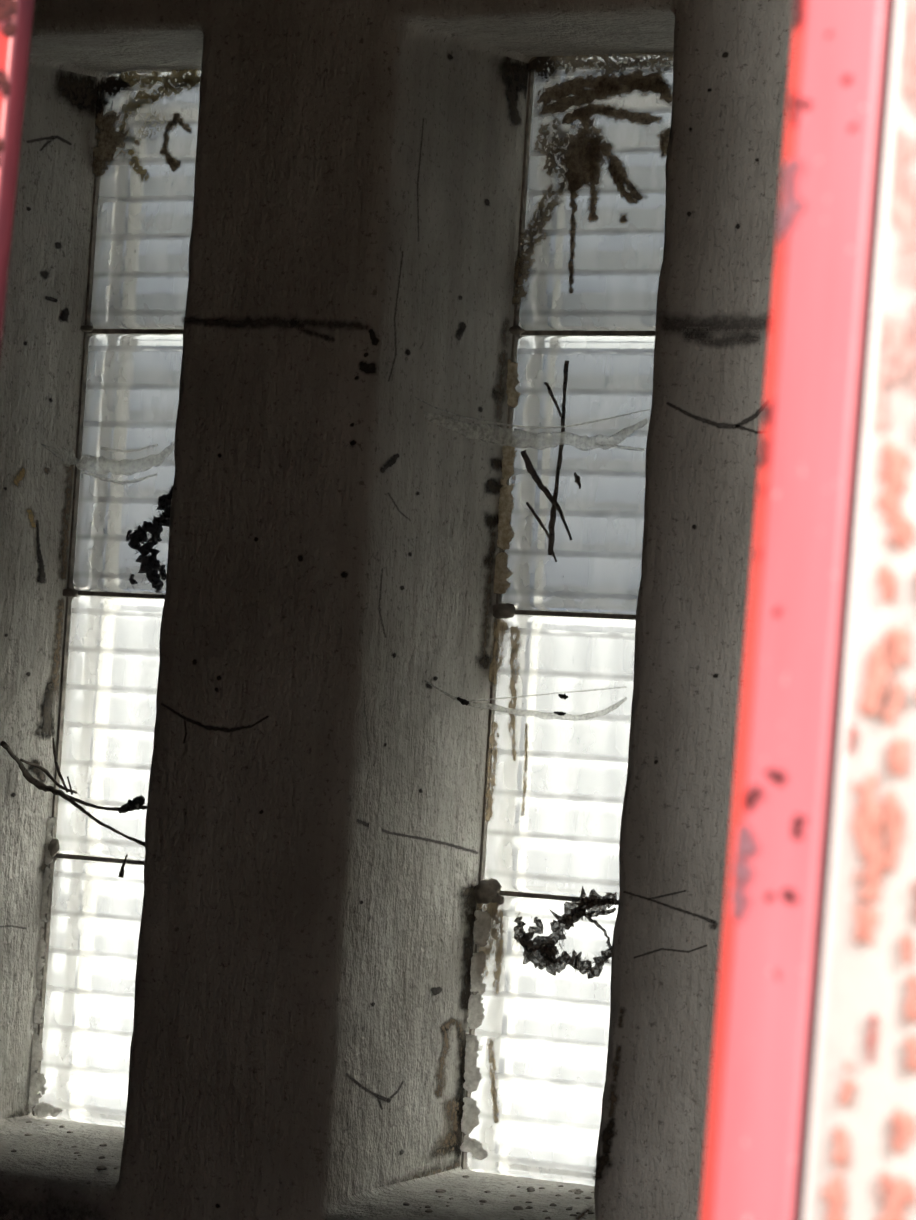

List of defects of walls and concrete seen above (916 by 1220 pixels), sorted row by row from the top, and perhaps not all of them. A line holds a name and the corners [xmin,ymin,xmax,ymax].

crack [182,119,424,381]
peeling [460,910,492,1161]